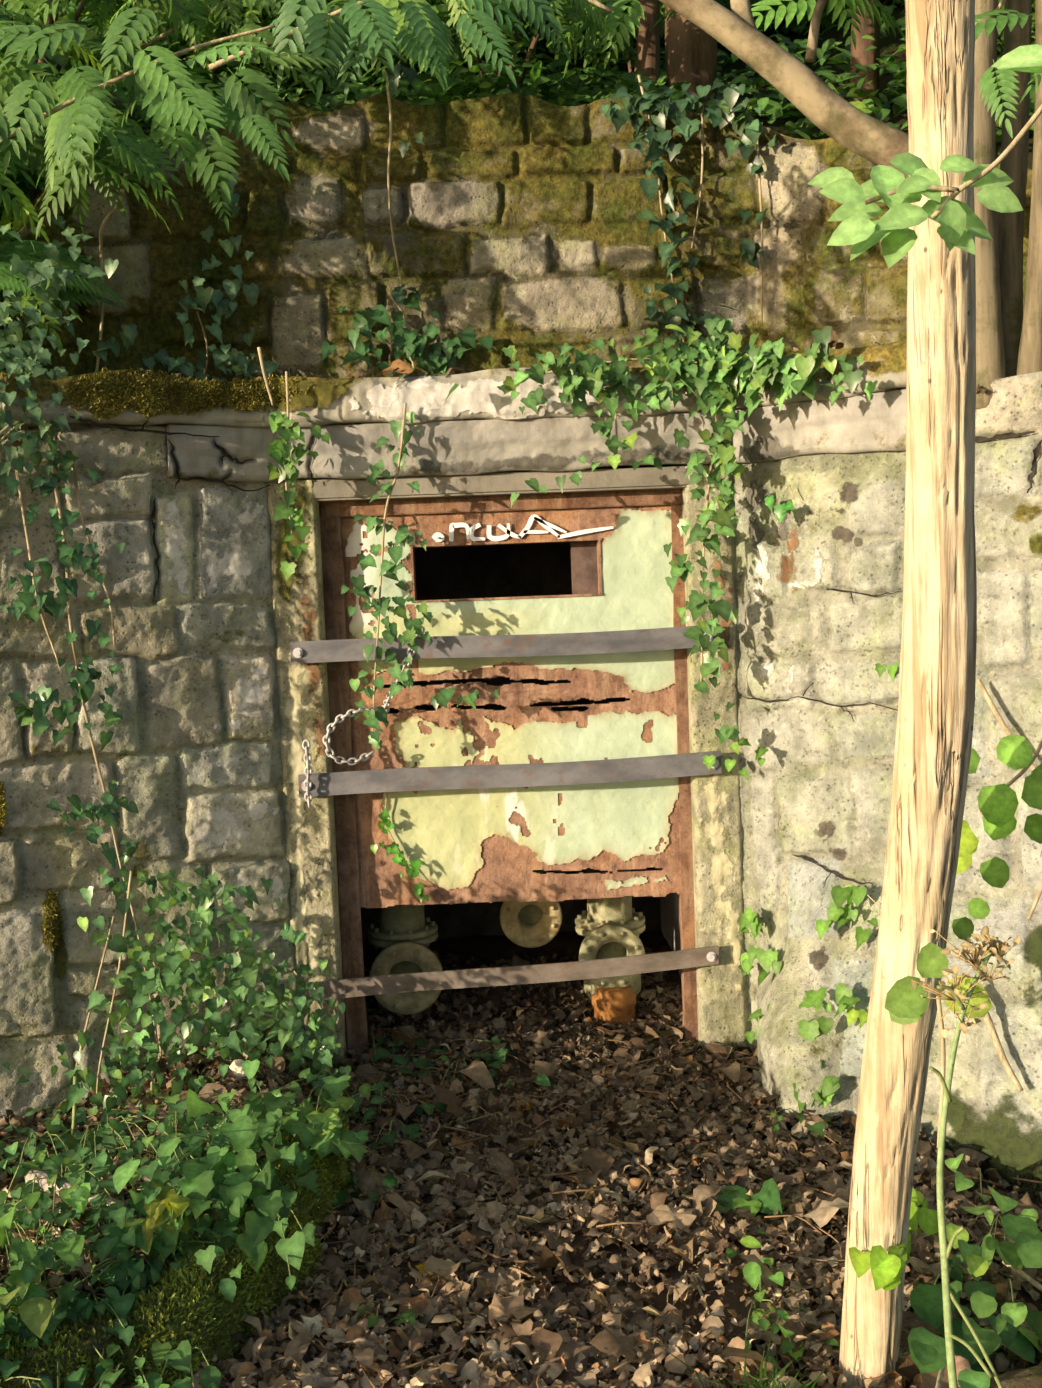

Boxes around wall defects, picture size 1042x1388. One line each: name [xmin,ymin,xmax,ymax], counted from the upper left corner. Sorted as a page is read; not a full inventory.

crack [975,431,1042,493]
crack [70,416,271,601]
crack [742,682,898,722]
water stain [1023,925,1042,971]